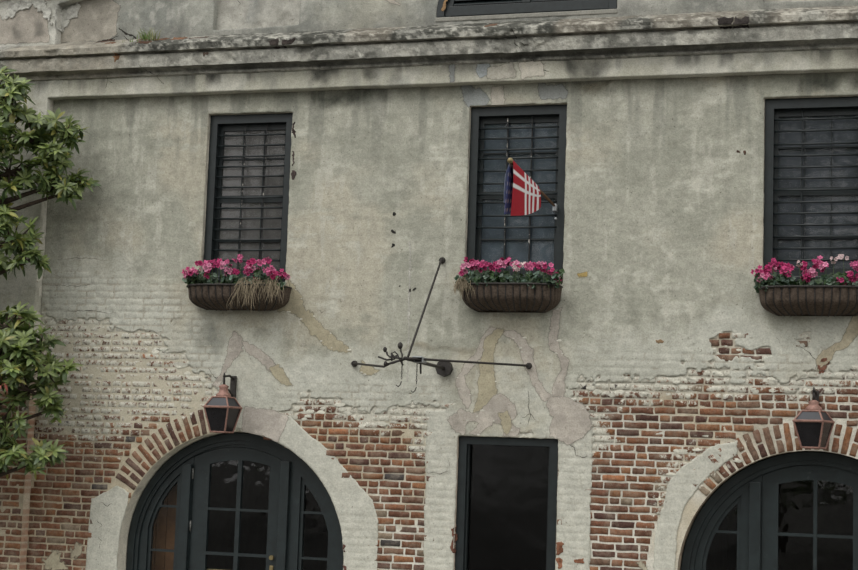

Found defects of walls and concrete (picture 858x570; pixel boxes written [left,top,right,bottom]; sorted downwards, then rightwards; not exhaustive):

flaking render [709,333,772,362]
peeling [35,308,219,428]
flaking render [586,378,630,397]
flaking render [750,376,812,394]
flaking render [286,398,352,421]
flaking render [358,405,415,428]
flaking render [673,448,702,456]
flaking render [555,541,564,569]